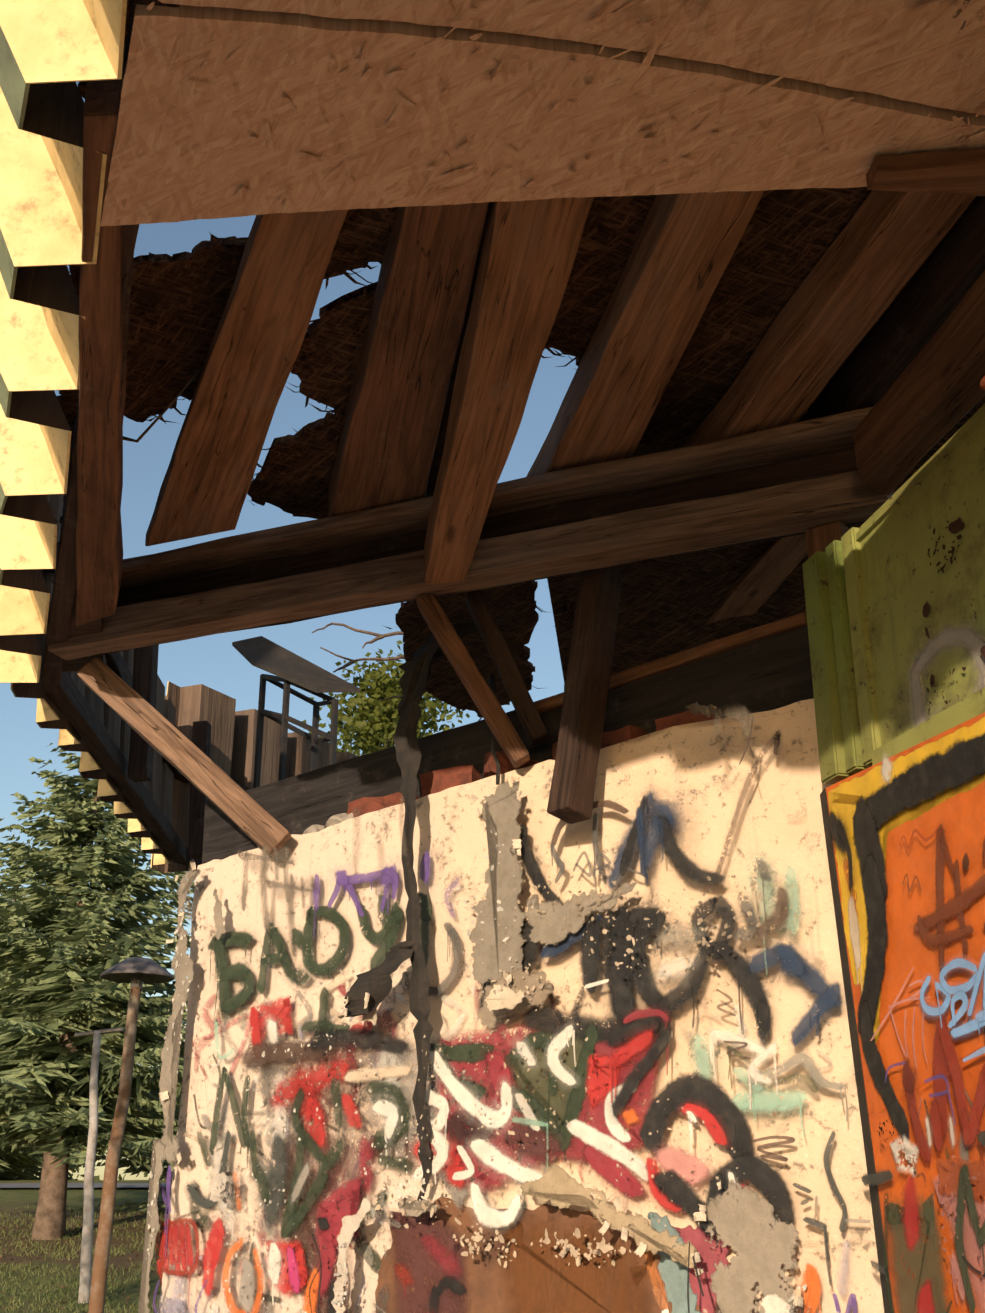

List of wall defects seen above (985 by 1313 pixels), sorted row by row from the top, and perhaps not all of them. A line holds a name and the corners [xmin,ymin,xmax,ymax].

peeling [926,667,966,715]
peeling [246,1038,337,1141]
peeling [331,742,810,1313]
peeling [172,1171,307,1313]